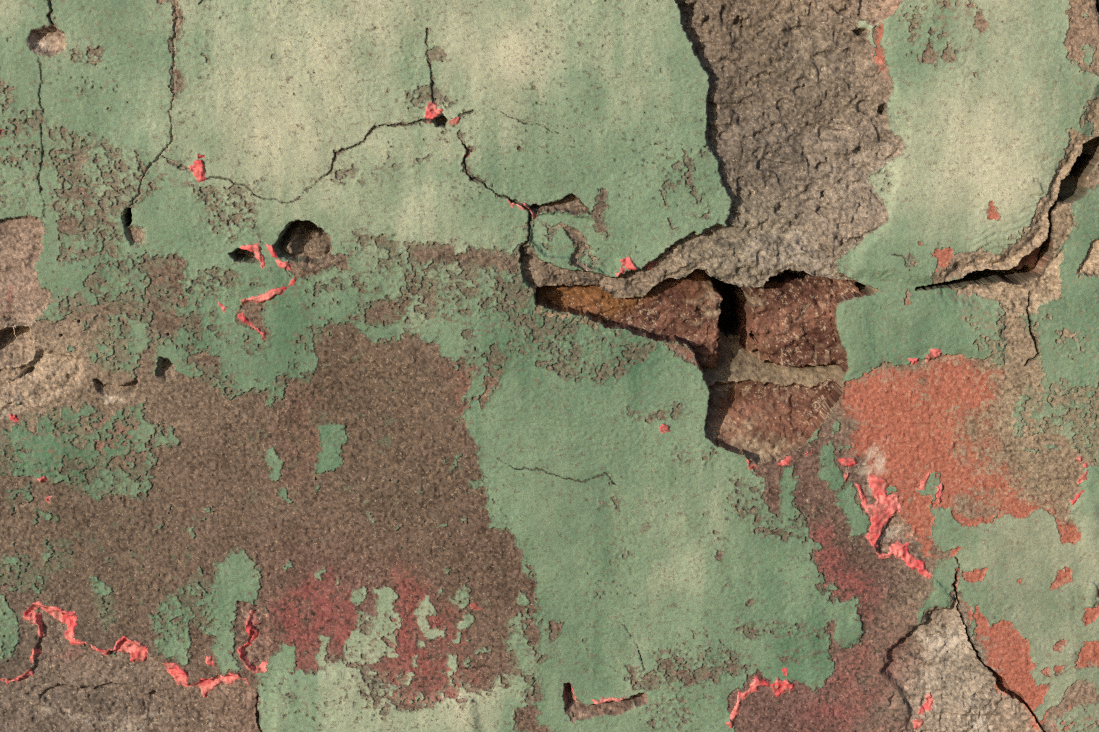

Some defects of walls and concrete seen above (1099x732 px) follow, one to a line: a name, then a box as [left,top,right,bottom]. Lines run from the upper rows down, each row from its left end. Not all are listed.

flaking render [27,25,67,58]
peeling [160,0,190,97]
crack [128,0,591,263]
peeling [426,47,447,63]
peeling [0,82,553,732]
flaking render [520,0,1099,732]
crack [887,136,1099,367]
crack [953,557,1046,732]